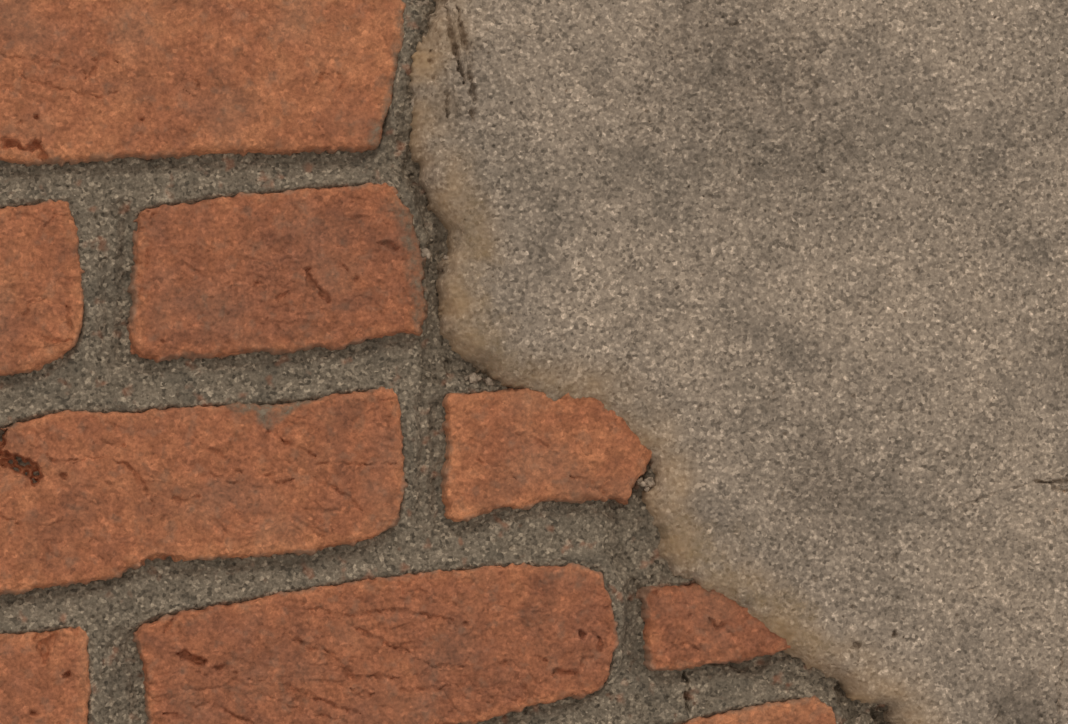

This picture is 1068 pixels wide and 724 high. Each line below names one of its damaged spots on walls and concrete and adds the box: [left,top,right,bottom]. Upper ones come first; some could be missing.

spalling [0,136,61,167]
spalling [420,248,449,272]
hole [303,267,332,304]
spalling [464,372,494,386]
hole [0,427,79,488]
spalling [636,477,656,492]
crack [955,471,1068,509]
hole [175,649,239,675]
hole [534,629,605,678]